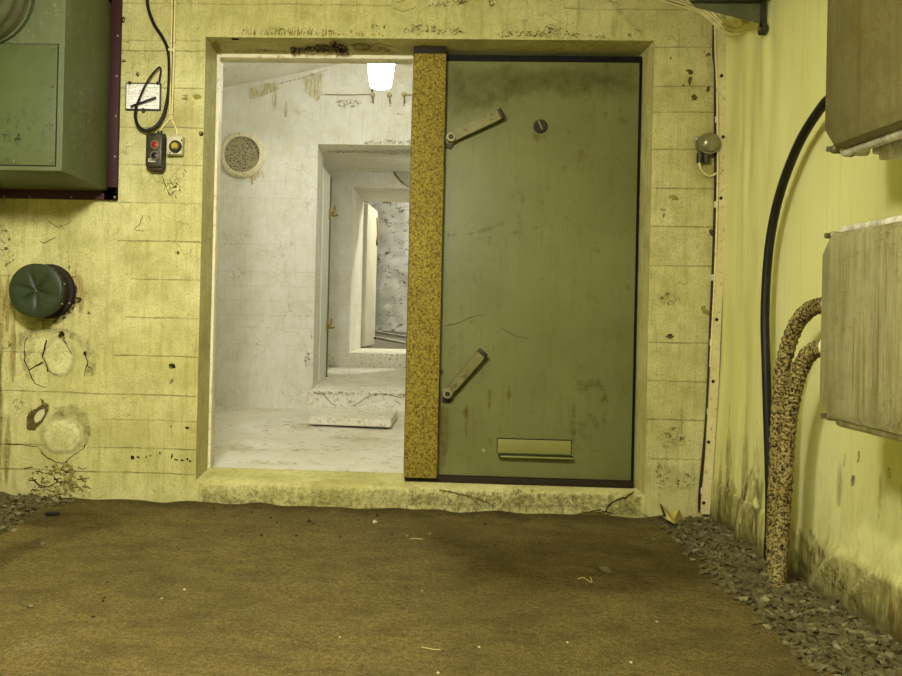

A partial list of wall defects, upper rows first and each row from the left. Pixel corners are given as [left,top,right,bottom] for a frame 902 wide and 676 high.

crack [24,338,93,388]
spalling [25,399,50,430]
crack [6,444,85,487]
crack [588,492,634,514]